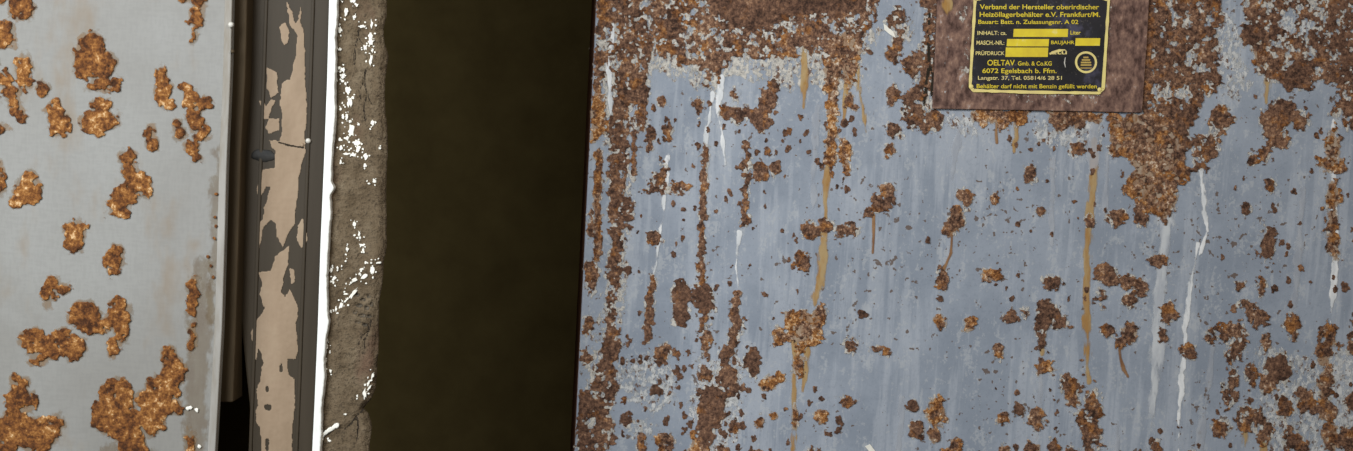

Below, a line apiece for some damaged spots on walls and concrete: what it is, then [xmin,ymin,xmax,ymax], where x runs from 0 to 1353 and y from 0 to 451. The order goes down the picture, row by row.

corrosion [0,372,64,451]
corrosion [0,0,123,138]
corrosion [17,276,131,367]
corrosion [106,126,158,219]
corrosion [90,275,201,451]
corrosion [154,66,214,162]
peeling [251,3,307,451]
corrosion [575,0,953,451]
corrosion [904,393,963,451]
corrosion [925,186,1000,333]
corrosion [970,0,1242,451]
corrosion [1157,0,1353,451]